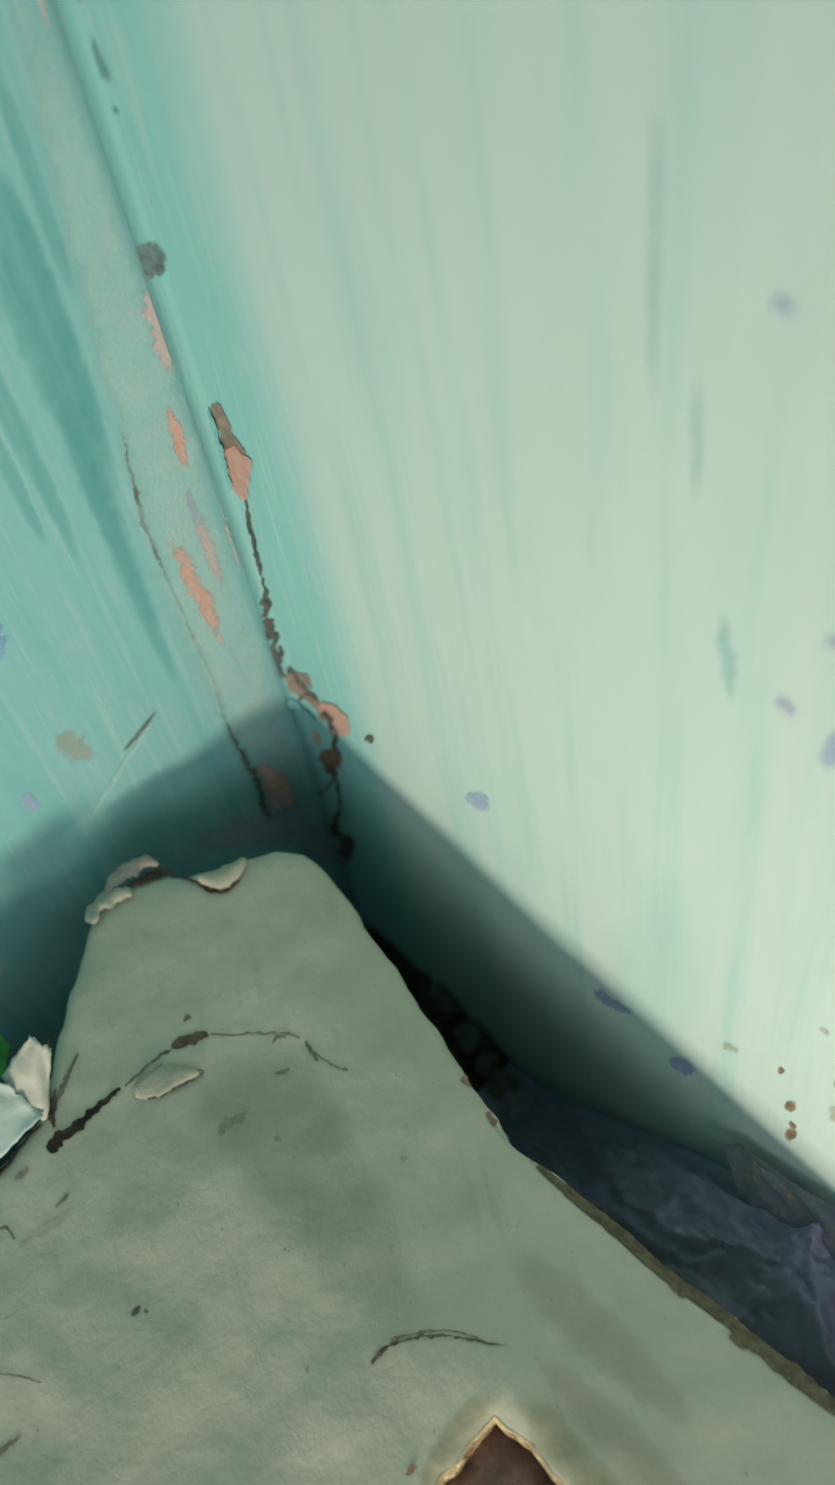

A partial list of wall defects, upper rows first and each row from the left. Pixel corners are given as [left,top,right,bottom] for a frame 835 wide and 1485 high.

peeling [167,411,188,466]
peeling [207,403,252,501]
crack [123,437,276,831]
peeling [174,515,240,645]
crack [244,500,353,854]
spalling [284,672,374,781]
peeling [85,855,247,924]
crack [0,1031,348,1173]
corrosion [785,1102,797,1140]
crack [371,1329,504,1364]